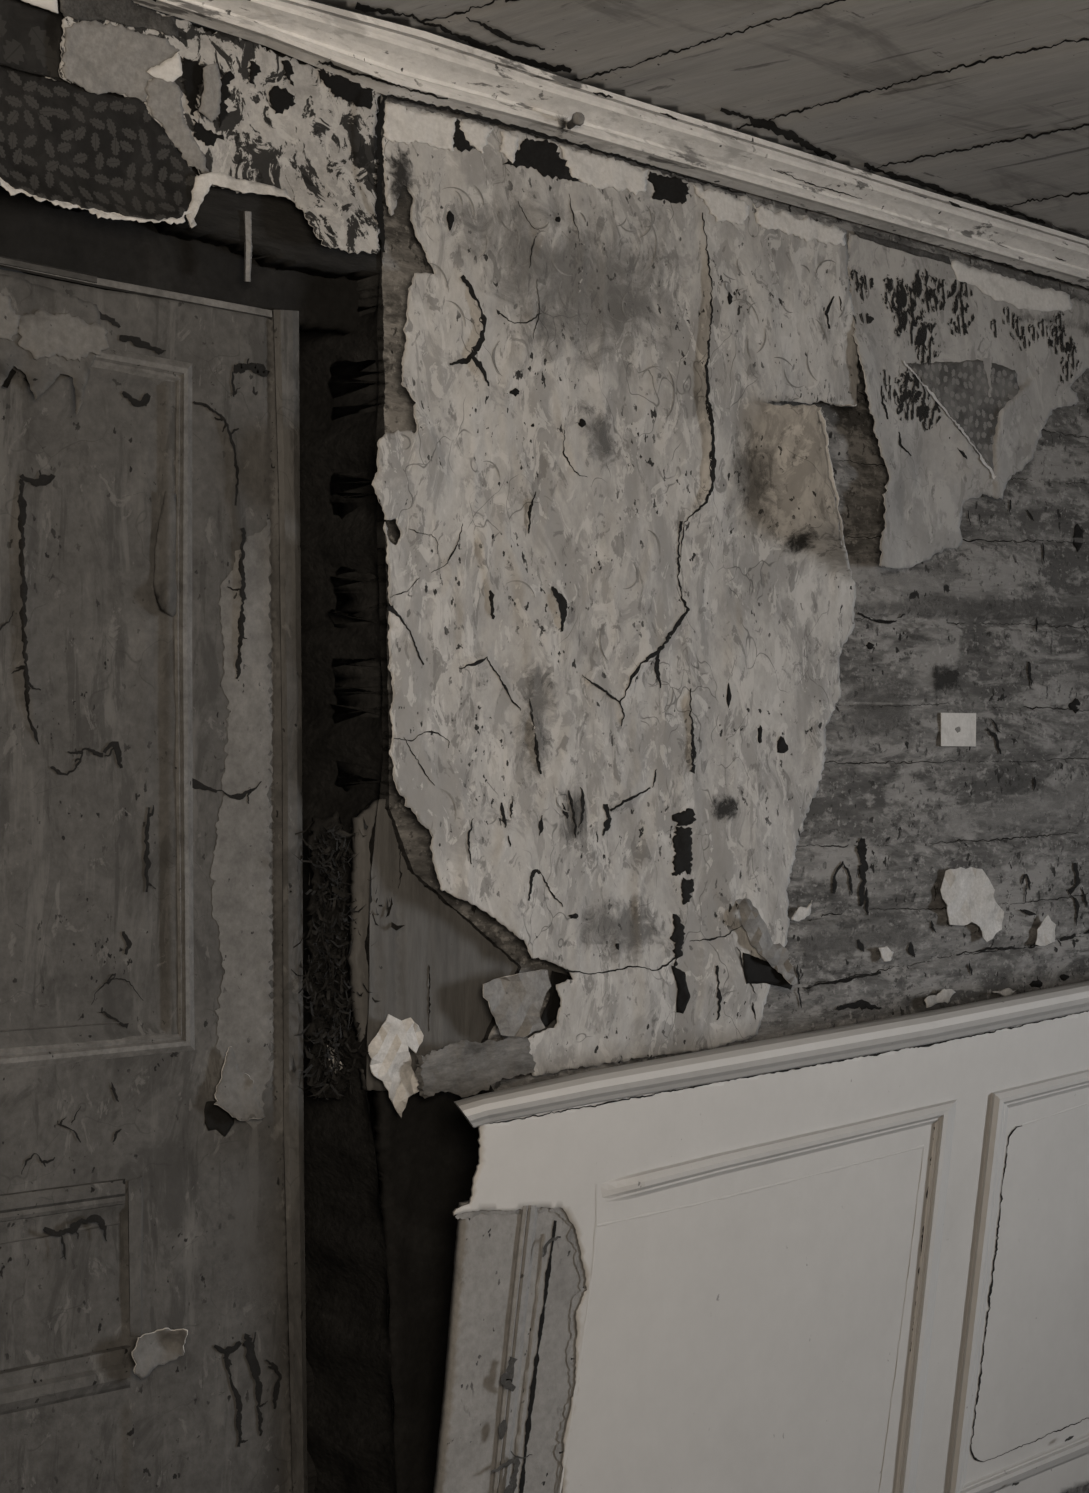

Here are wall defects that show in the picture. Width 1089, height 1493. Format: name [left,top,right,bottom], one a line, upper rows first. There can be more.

peeling [382,103,1072,312]
crack [582,521,690,726]
peeling [791,901,812,922]
peeling [879,946,894,962]
peeling [940,867,1004,942]
peeling [1035,914,1056,946]
spalling [541,971,571,1027]
peeling [214,1046,265,1121]
peeling [131,1328,188,1379]